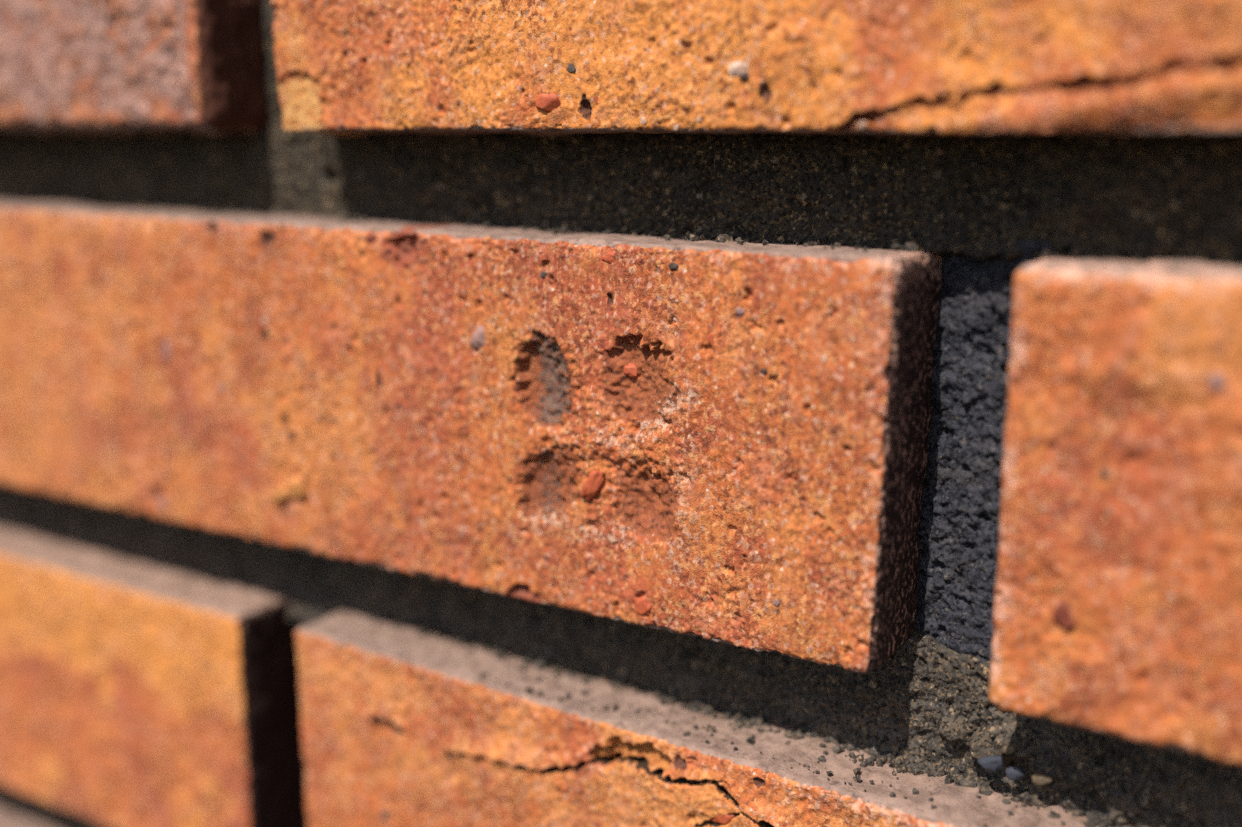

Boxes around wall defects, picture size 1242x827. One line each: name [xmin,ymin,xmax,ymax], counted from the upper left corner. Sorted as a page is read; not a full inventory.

crack [837,56,1242,134]
spalling [513,331,578,426]
spalling [603,335,680,425]
spalling [519,446,579,522]
spalling [612,467,677,542]
crack [448,736,774,827]